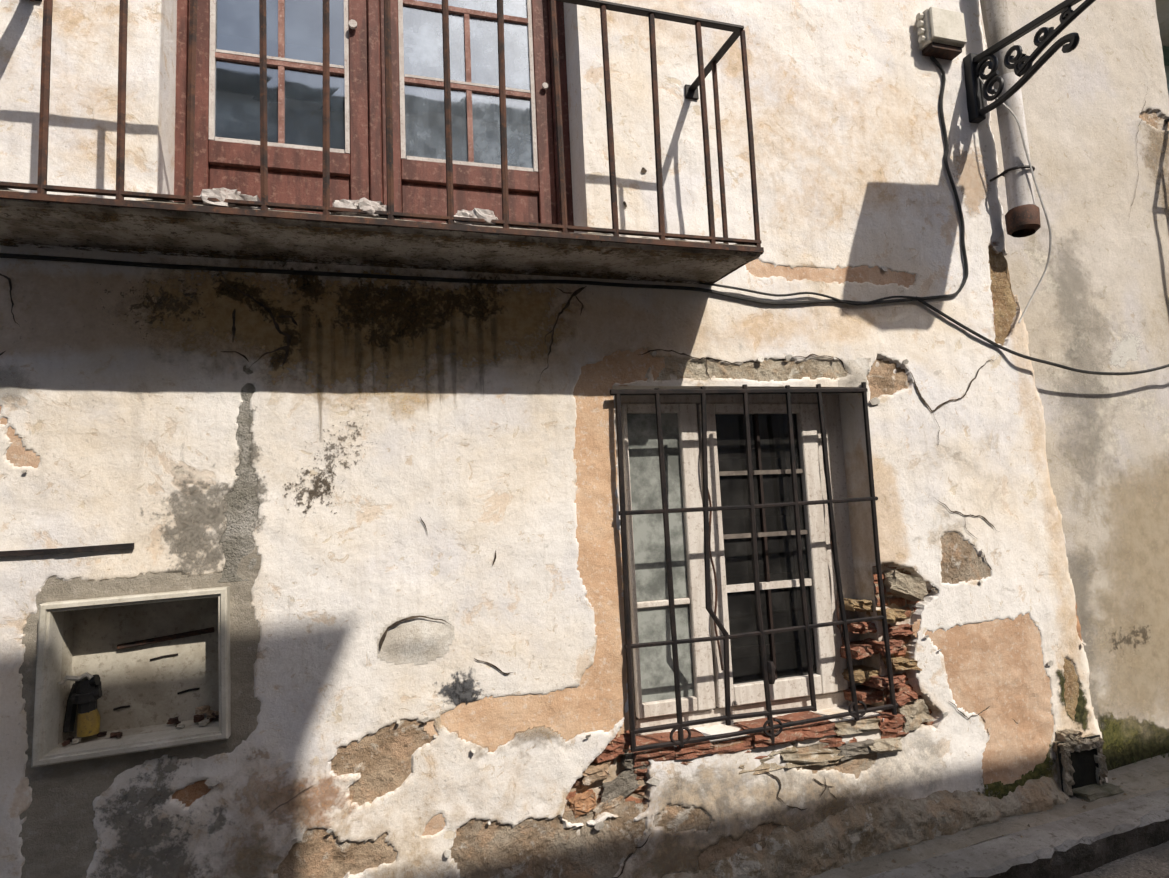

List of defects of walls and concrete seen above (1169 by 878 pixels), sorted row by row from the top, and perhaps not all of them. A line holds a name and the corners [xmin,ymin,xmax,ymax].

peeling [0,406,40,473]
leakage [0,206,755,514]
crack [539,286,587,381]
peeling [745,259,916,288]
spalling [866,358,909,405]
crack [910,354,1000,447]
spalling [988,246,1017,346]
leakage [141,409,267,577]
spalling [931,532,991,593]
peeling [912,613,1079,785]
spalling [780,741,885,779]
spalling [422,799,712,878]